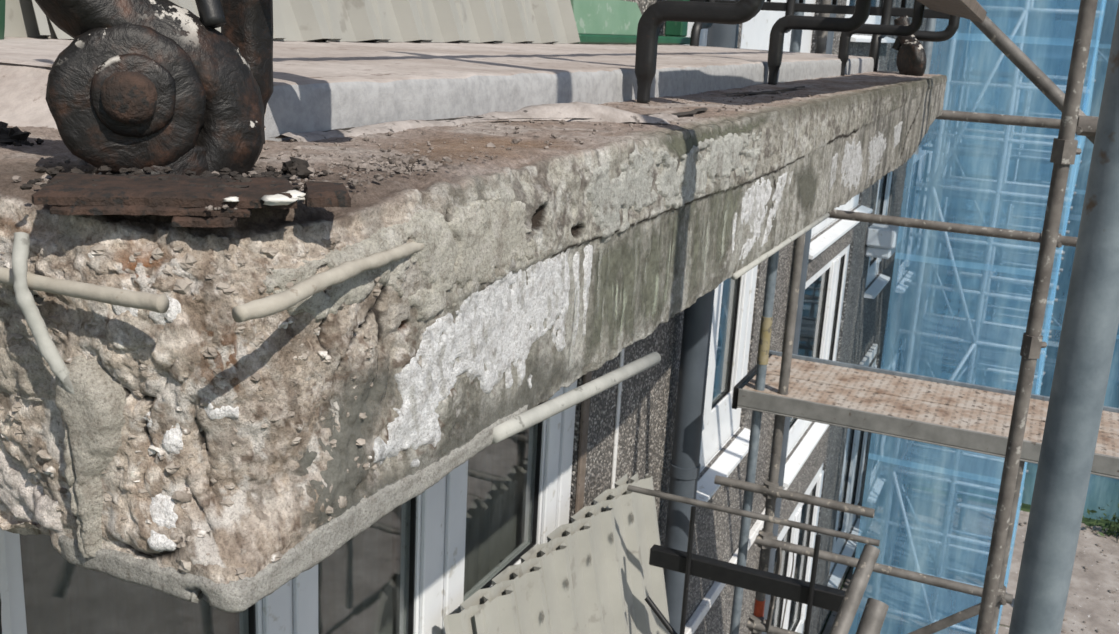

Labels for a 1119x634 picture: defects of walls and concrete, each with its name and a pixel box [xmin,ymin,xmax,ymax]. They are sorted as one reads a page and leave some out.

leakage [797,169,817,209]
spalling [0,227,425,579]
leakage [298,371,392,527]
peeling [347,245,593,473]
leakage [411,289,578,475]